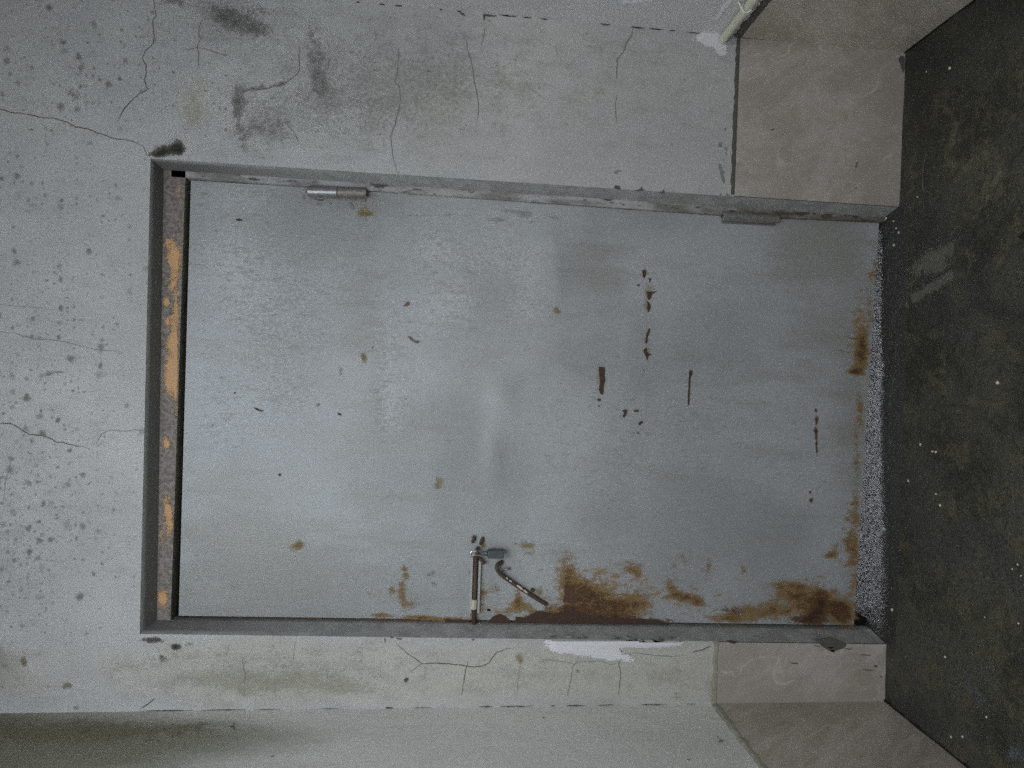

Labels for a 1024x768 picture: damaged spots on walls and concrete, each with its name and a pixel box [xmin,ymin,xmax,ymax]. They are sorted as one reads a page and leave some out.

crack [0,0,156,155]
crack [185,18,224,65]
leakage [212,5,270,38]
crack [239,47,300,94]
crack [466,15,548,121]
leakage [232,82,284,149]
crack [390,55,401,171]
corrosion [824,253,879,572]
corrosion [287,552,859,628]
crack [140,647,274,711]
crack [397,644,528,707]
crack [551,647,709,706]